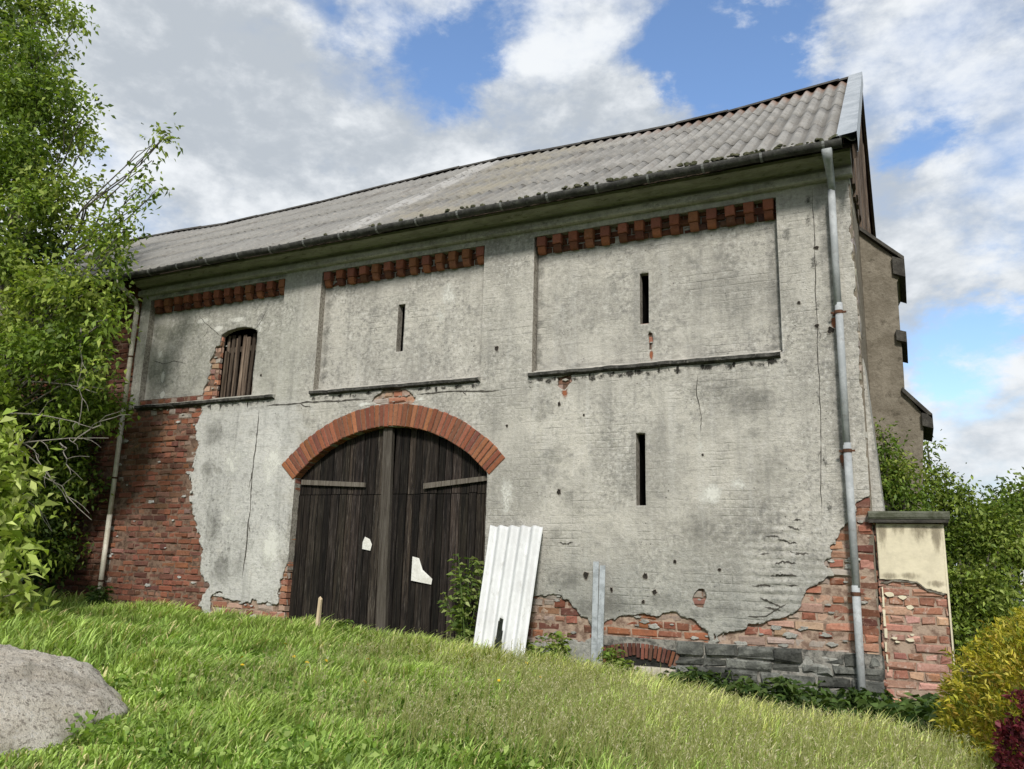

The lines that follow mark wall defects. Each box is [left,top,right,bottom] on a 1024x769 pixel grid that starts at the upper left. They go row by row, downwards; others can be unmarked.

spalling [102,337,291,619]
crack [242,399,366,575]
spalling [372,390,416,405]
crack [812,200,822,505]
spalling [527,498,946,655]